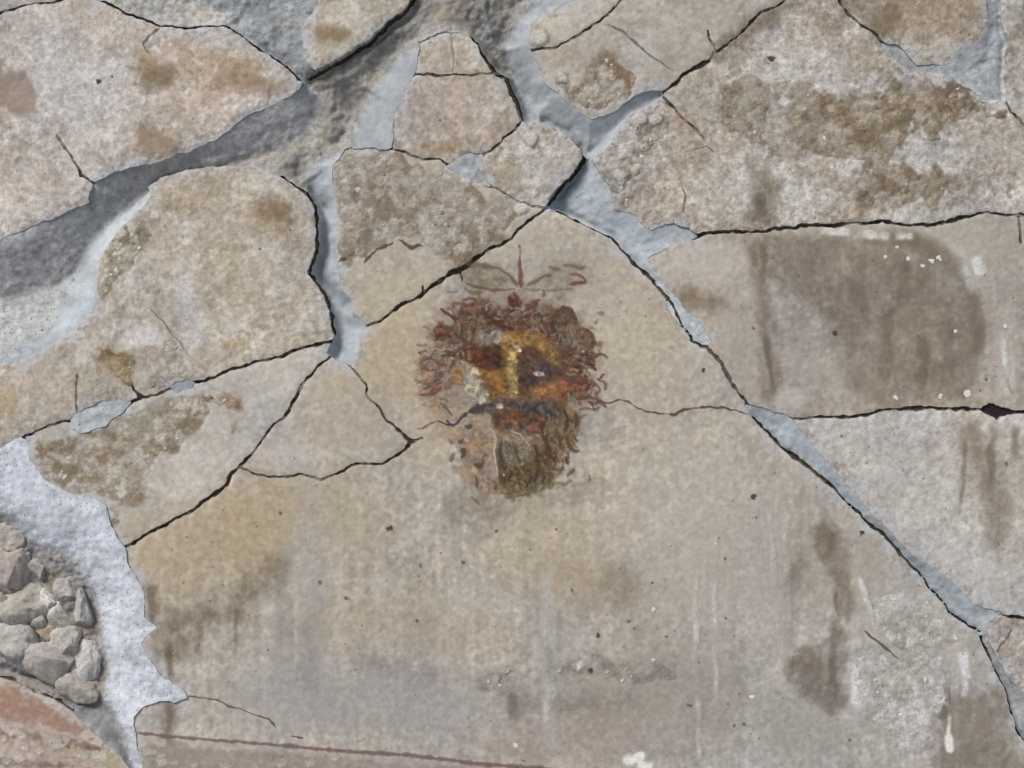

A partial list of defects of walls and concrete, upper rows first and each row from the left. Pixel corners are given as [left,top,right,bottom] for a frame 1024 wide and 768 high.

crack [0,0,63,15]
crack [103,0,416,81]
crack [414,33,524,156]
crack [531,0,786,152]
crack [56,135,95,185]
leakage [819,227,987,354]
crack [125,176,494,547]
crack [23,373,78,439]
crack [366,146,1024,741]
crack [0,676,74,711]
leakage [791,635,870,708]
peeling [0,726,108,765]